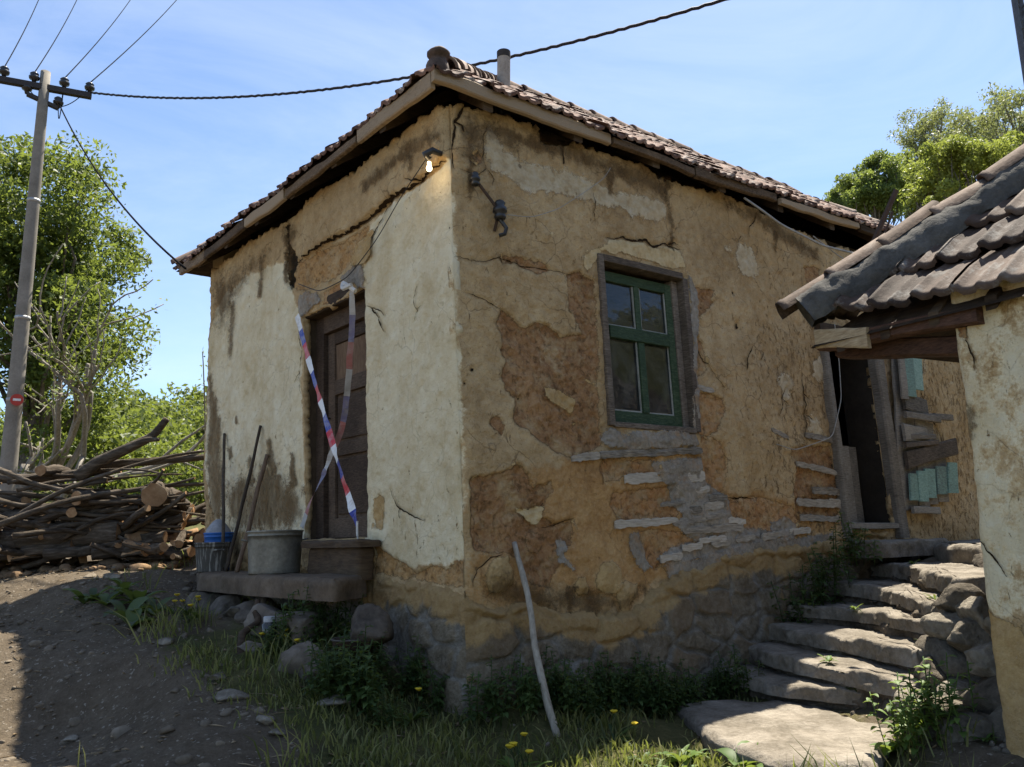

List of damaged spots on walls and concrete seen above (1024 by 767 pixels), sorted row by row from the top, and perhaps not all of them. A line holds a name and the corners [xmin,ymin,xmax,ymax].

crack [298,107,494,263]
damp [362,133,439,193]
peeling [470,131,667,222]
damp [214,255,265,357]
damp [283,227,295,283]
crack [457,256,565,274]
spalling [490,239,693,570]
damp [226,438,305,531]
spalling [371,495,385,530]
spalling [469,461,577,588]
spalling [699,393,838,539]
crack [980,541,1007,577]